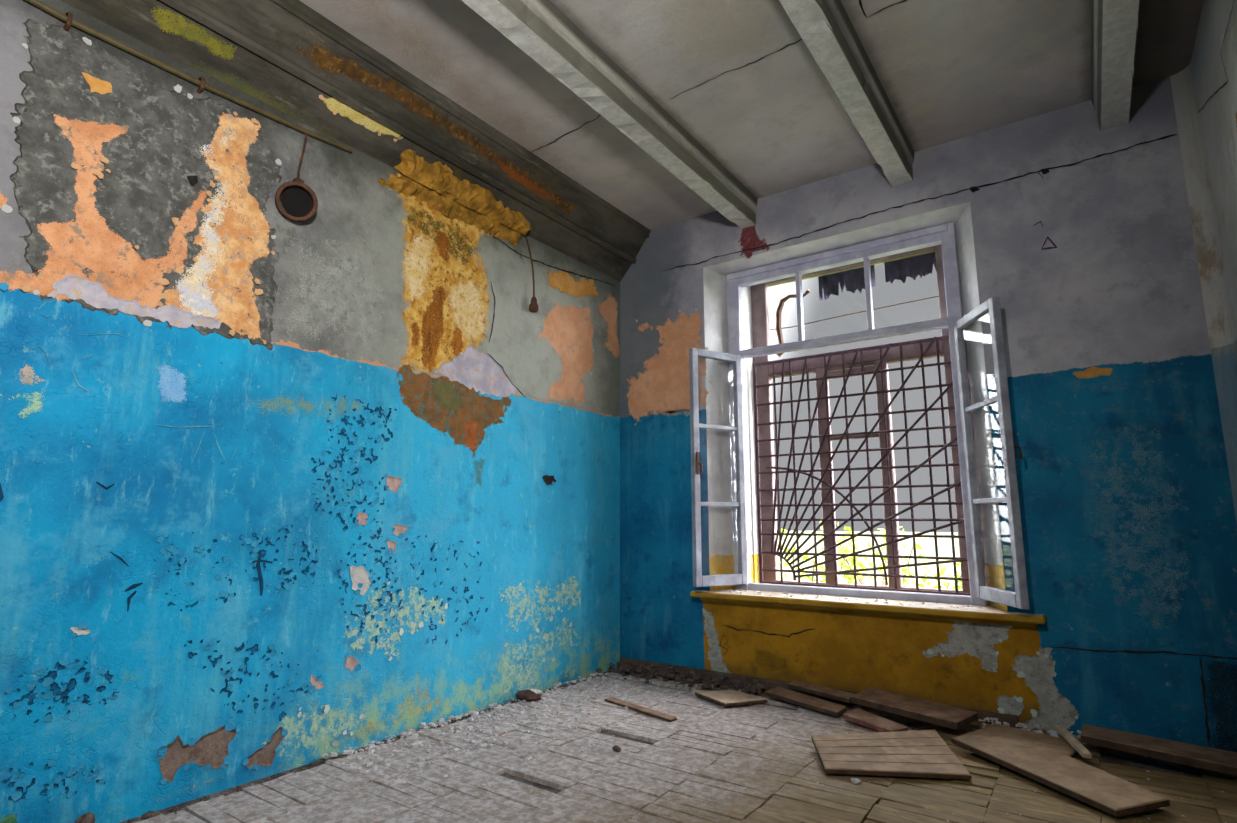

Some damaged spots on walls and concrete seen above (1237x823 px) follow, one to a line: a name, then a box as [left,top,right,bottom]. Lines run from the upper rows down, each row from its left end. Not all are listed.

crack [671,39,802,99]
crack [859,0,907,18]
crack [1197,0,1235,113]
peeling [0,19,282,350]
flaking render [378,149,531,246]
crack [664,134,1177,271]
peeling [434,345,517,397]
peeling [627,308,712,425]
peeling [154,532,236,612]
peeling [239,391,581,695]
flaking render [154,639,324,785]
peeling [922,621,1079,731]